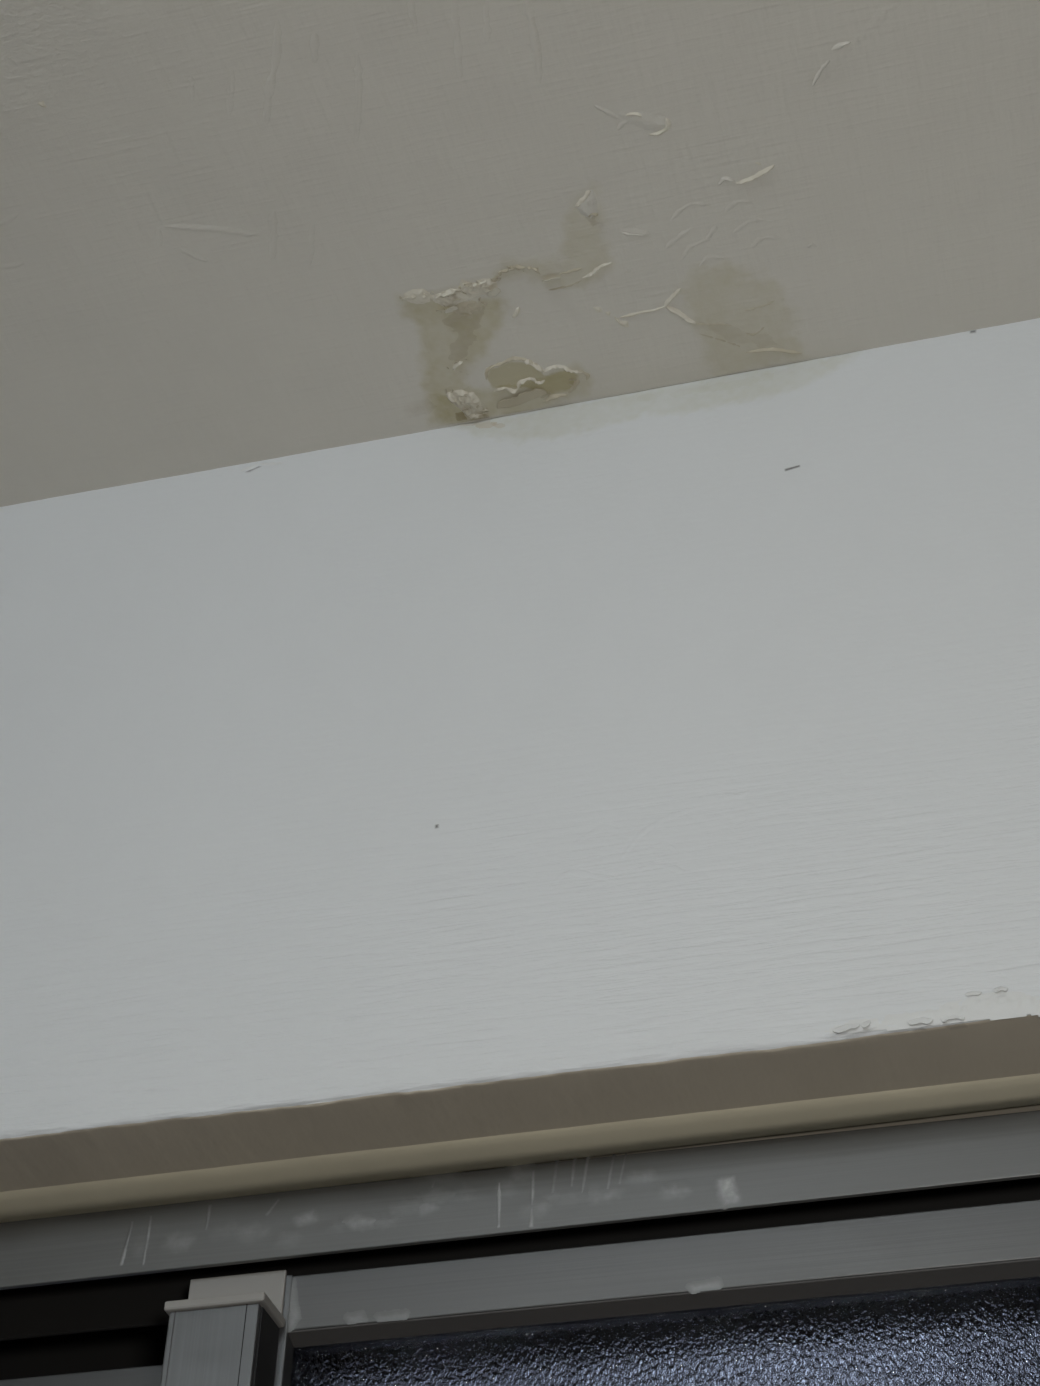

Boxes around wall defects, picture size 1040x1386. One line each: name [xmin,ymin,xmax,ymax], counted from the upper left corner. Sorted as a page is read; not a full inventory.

peeling [399,262,612,317]
damp [391,179,864,450]
peeling [445,356,590,420]